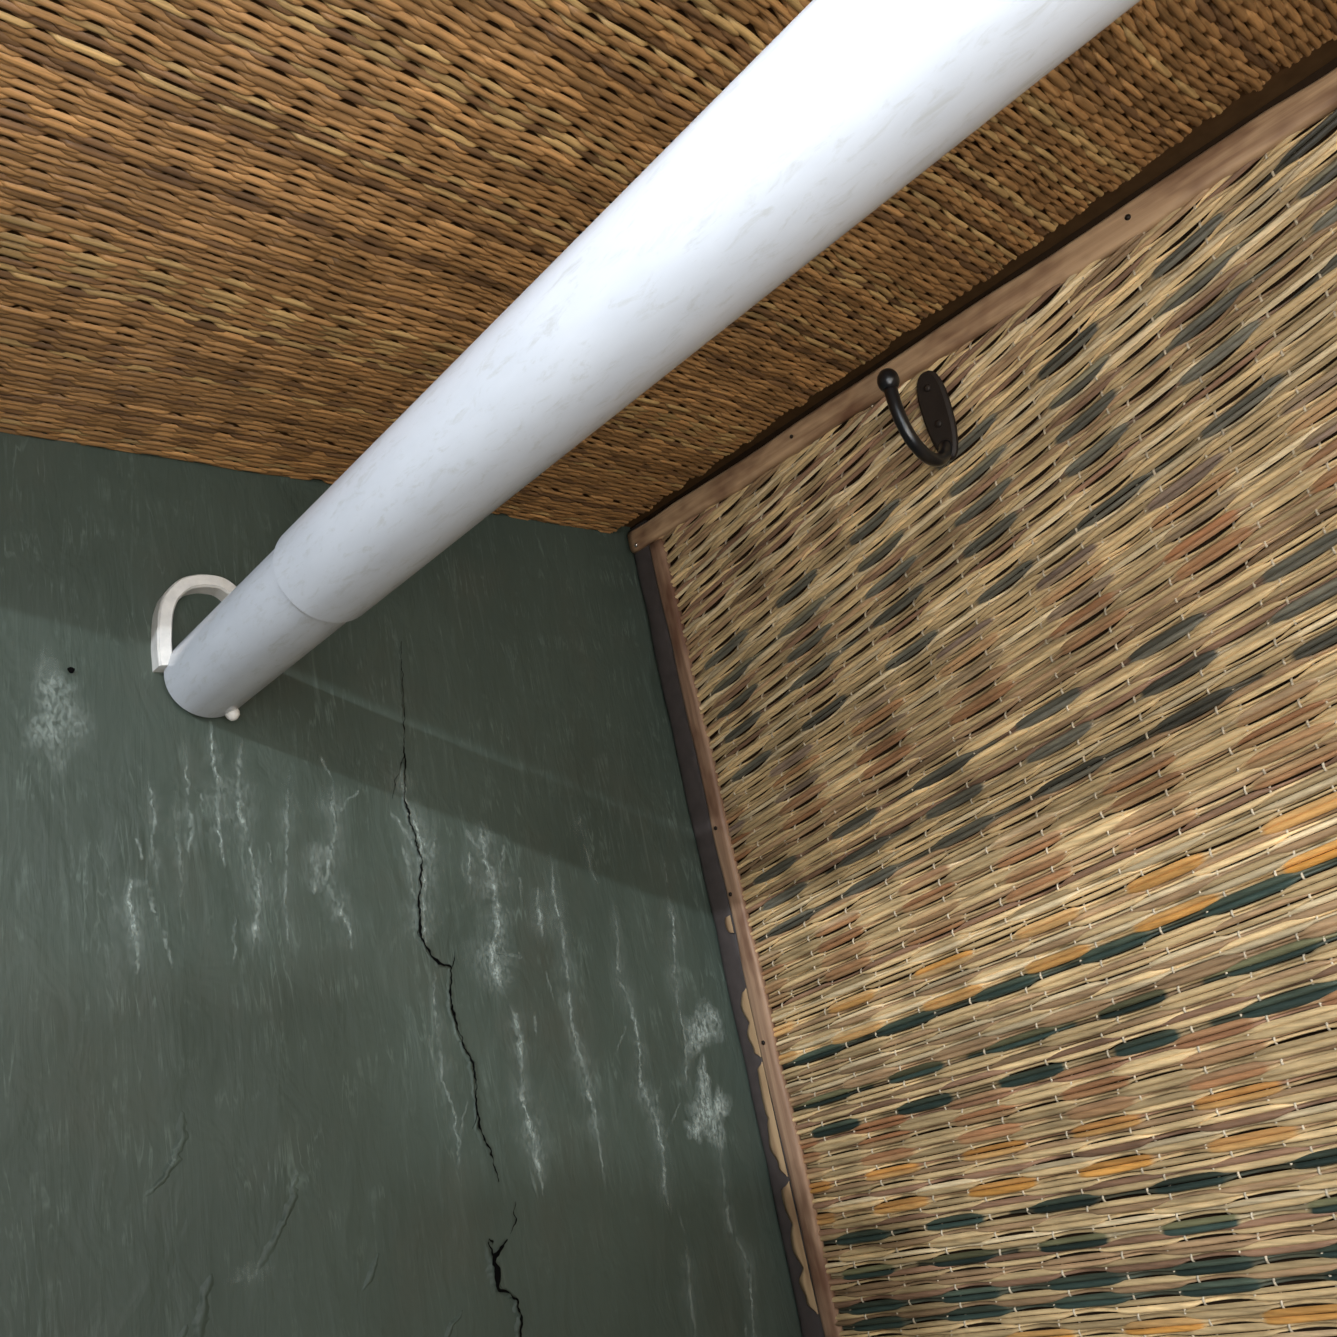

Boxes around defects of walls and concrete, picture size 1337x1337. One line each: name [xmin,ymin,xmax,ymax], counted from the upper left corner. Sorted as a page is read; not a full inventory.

water stain [468,854,500,978]
crack [392,643,524,1337]
water stain [685,1066,723,1136]